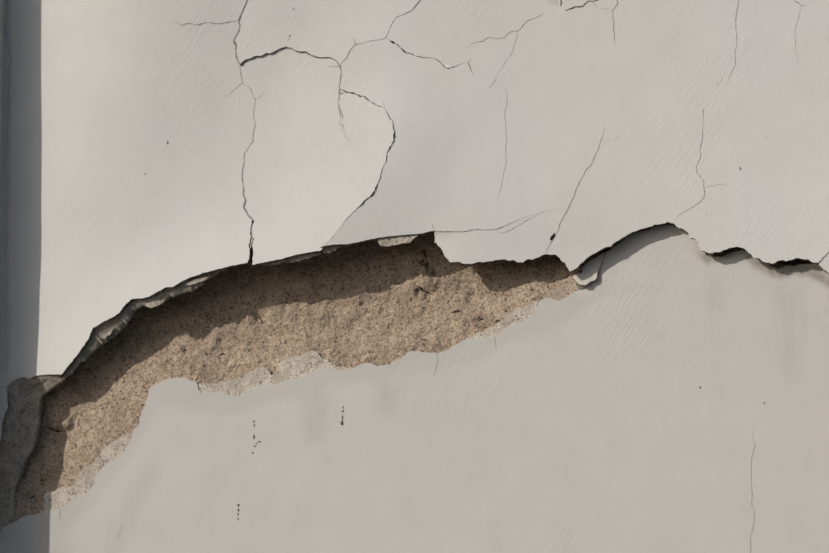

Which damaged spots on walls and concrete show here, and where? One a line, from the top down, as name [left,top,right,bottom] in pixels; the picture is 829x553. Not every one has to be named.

crack [560,0,618,43]
crack [175,0,539,240]
crack [547,137,617,250]
crack [600,109,724,264]
crack [706,247,745,257]
crack [769,254,827,269]
flaking render [0,232,600,531]